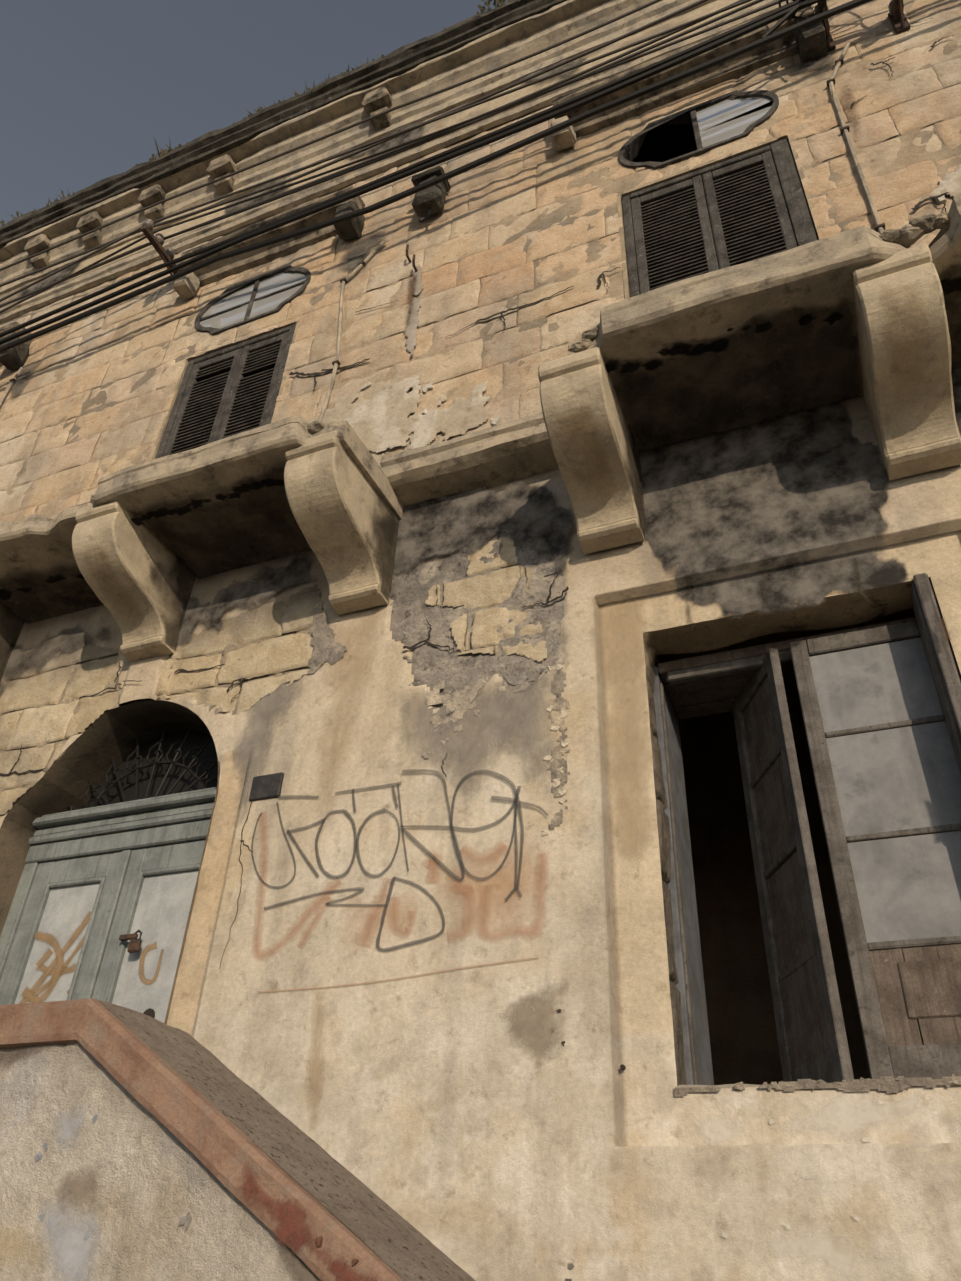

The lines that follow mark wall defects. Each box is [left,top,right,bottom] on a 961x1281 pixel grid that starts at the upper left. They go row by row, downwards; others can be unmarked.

peeling [307,375,501,455]
peeling [390,532,570,836]
crack [219,801,252,969]
damp [511,992,565,1055]